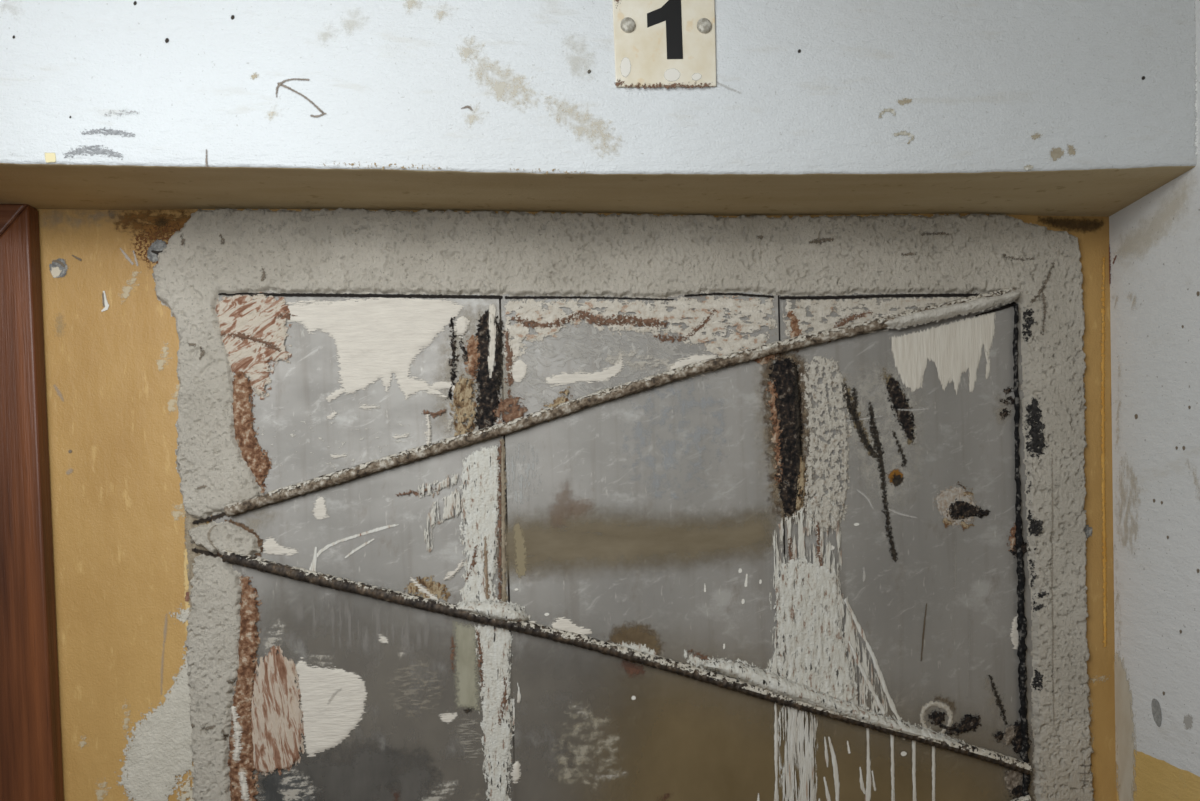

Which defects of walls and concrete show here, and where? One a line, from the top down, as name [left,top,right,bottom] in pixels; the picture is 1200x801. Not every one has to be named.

rust [215,292,296,493]
peeling [397,473,463,552]
water stain [290,304,811,603]
spalling [224,286,1017,517]
water stain [827,310,900,344]
water stain [844,368,918,497]
rust [227,574,305,801]
peeling [510,761,522,783]
spalling [183,512,1032,775]
water stain [259,522,1012,801]